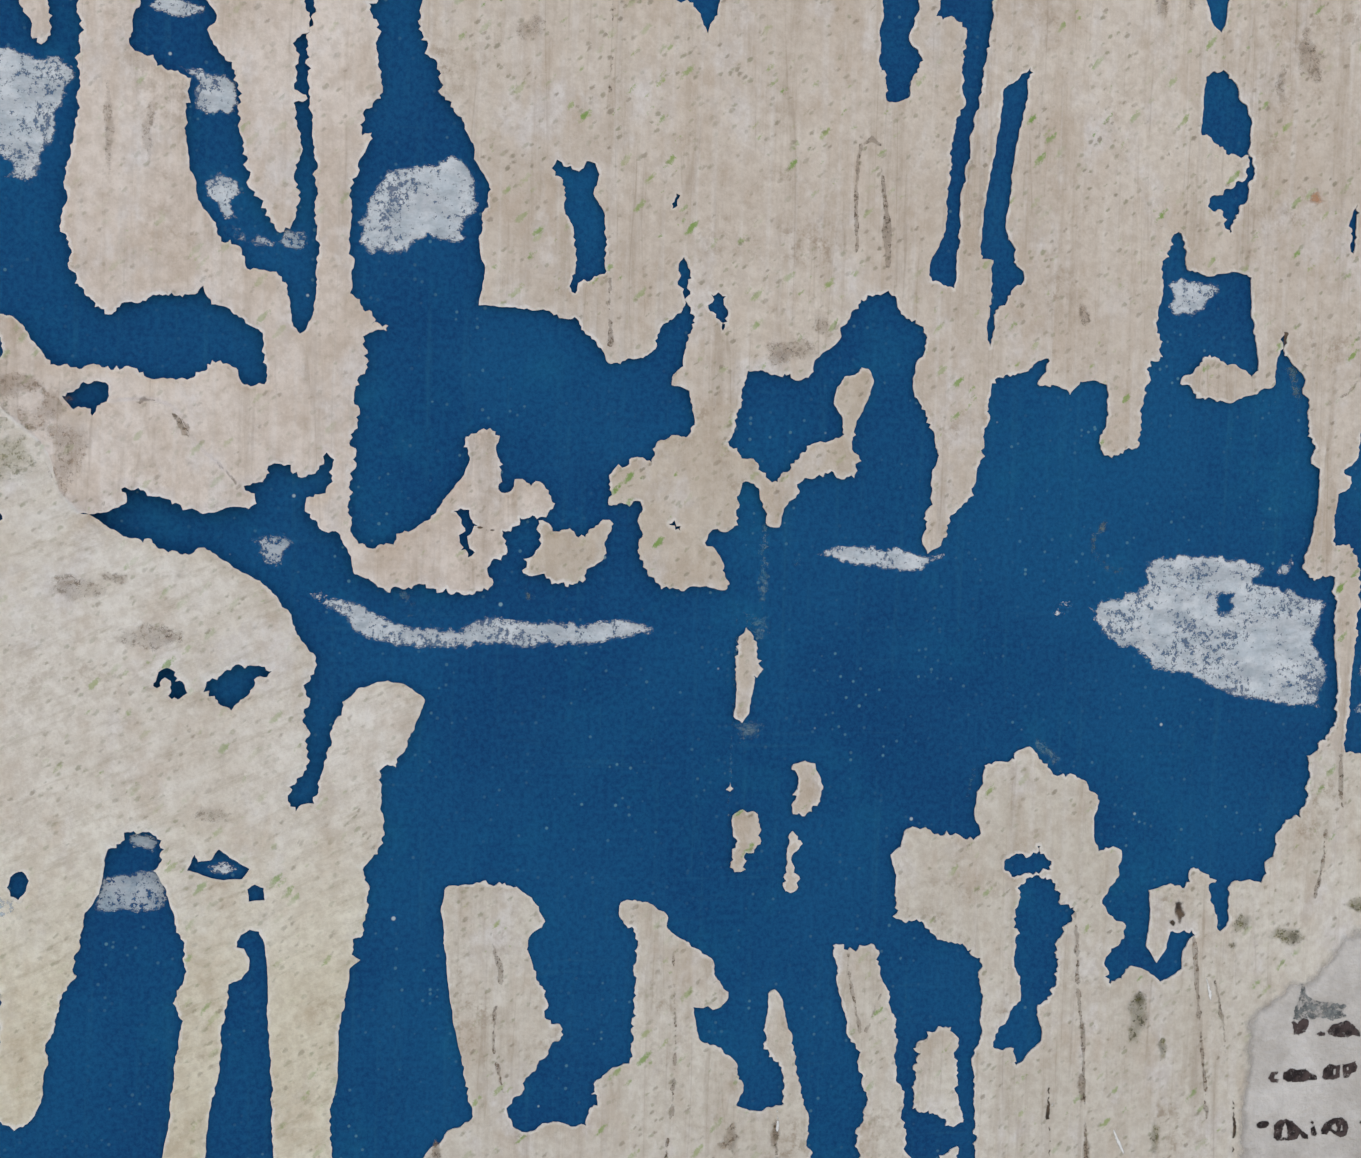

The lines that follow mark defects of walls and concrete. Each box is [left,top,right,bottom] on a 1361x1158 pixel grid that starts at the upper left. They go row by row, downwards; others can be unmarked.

peeling [0,0,613,595]
peeling [418,0,1361,1158]